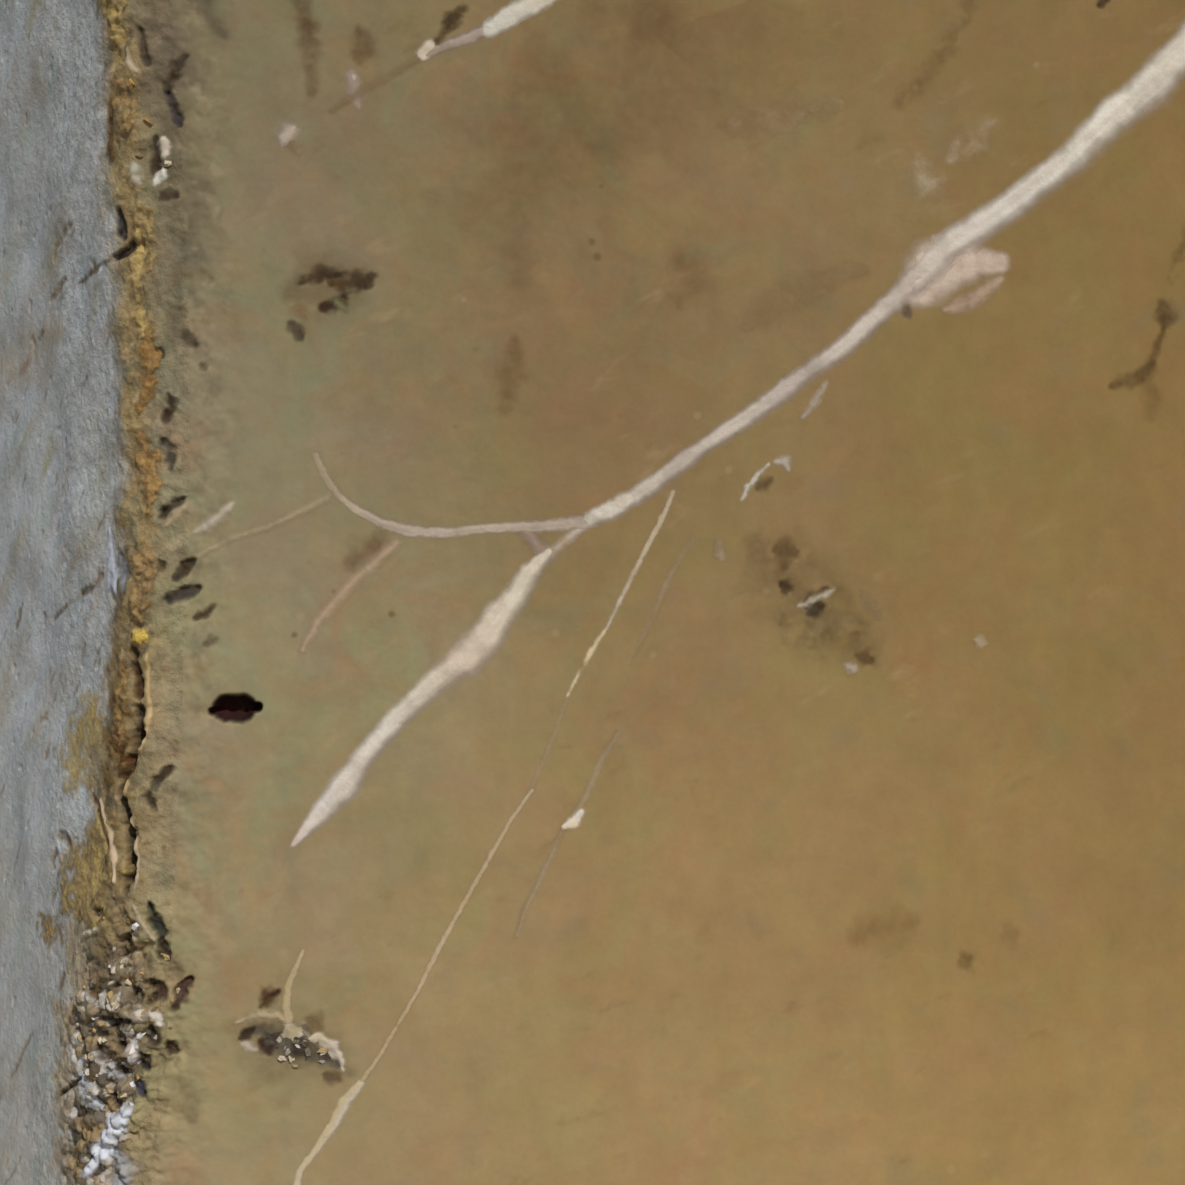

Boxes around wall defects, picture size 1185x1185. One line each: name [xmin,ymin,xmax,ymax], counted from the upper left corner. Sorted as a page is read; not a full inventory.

crack [417,0,555,61]
crack [194,25,1185,847]
crack [95,647,172,895]
crack [516,733,618,936]
spalling [62,903,194,1185]
spalling [235,949,345,1082]
crack [293,788,534,1185]